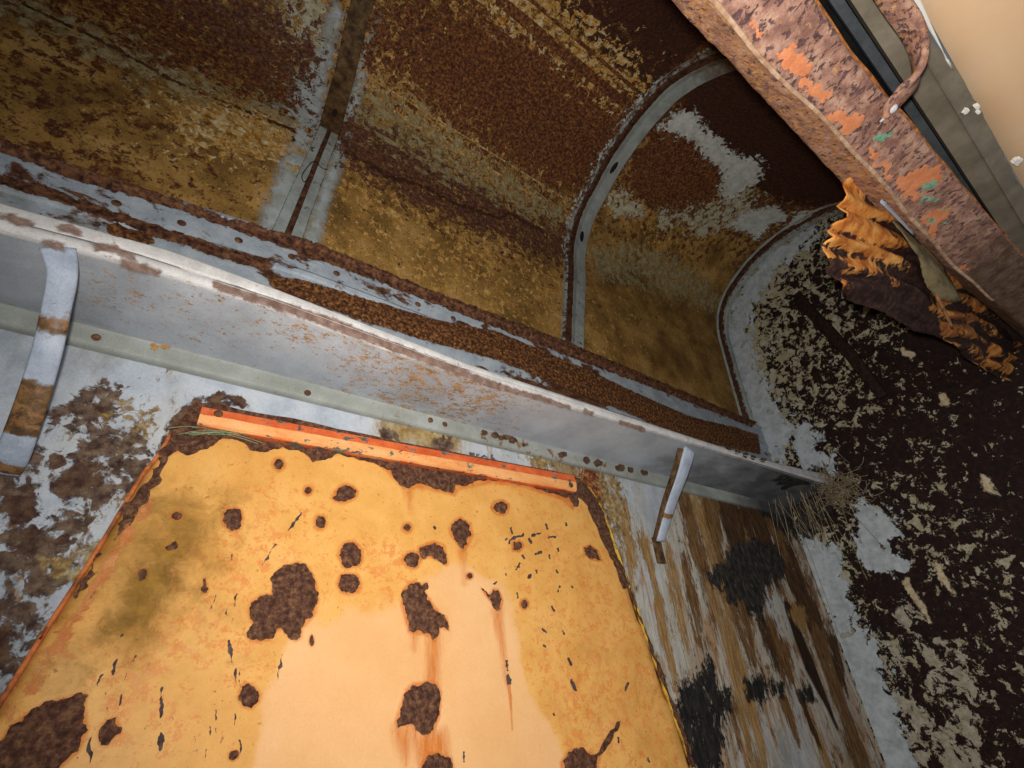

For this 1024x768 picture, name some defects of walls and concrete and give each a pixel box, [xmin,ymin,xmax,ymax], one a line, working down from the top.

rust [334,0,706,282]
rust [597,70,846,224]
peeling [776,42,865,136]
peeling [868,130,953,238]
rust [0,135,767,463]
rust [0,692,122,768]
rust [0,378,248,696]
rust [246,563,319,646]
rust [396,582,453,768]
damp [675,653,820,768]
peeling [795,497,998,768]
peeling [980,474,995,493]